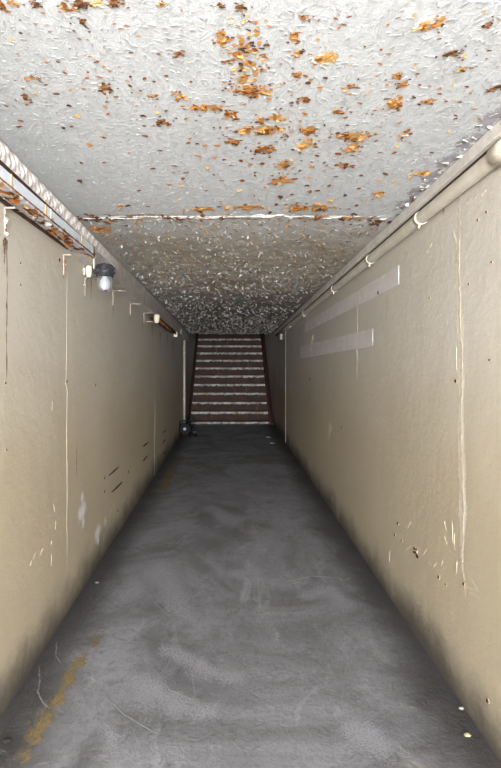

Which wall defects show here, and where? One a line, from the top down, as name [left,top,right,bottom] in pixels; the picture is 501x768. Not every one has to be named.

rust [0,182,94,258]
crack [63,317,71,398]
peeling [0,0,501,335]
crack [443,196,468,597]